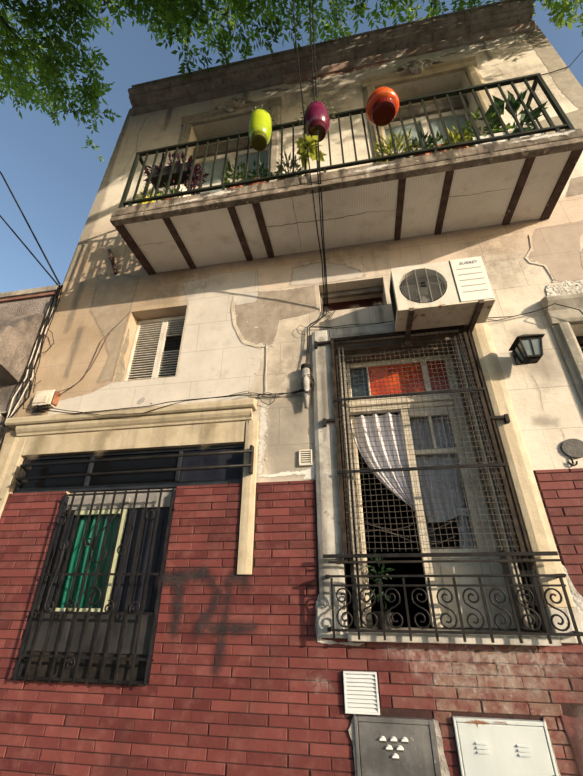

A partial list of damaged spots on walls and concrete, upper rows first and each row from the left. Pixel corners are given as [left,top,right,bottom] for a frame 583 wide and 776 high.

flaking render [525,220,583,296]
flaking render [228,285,317,350]